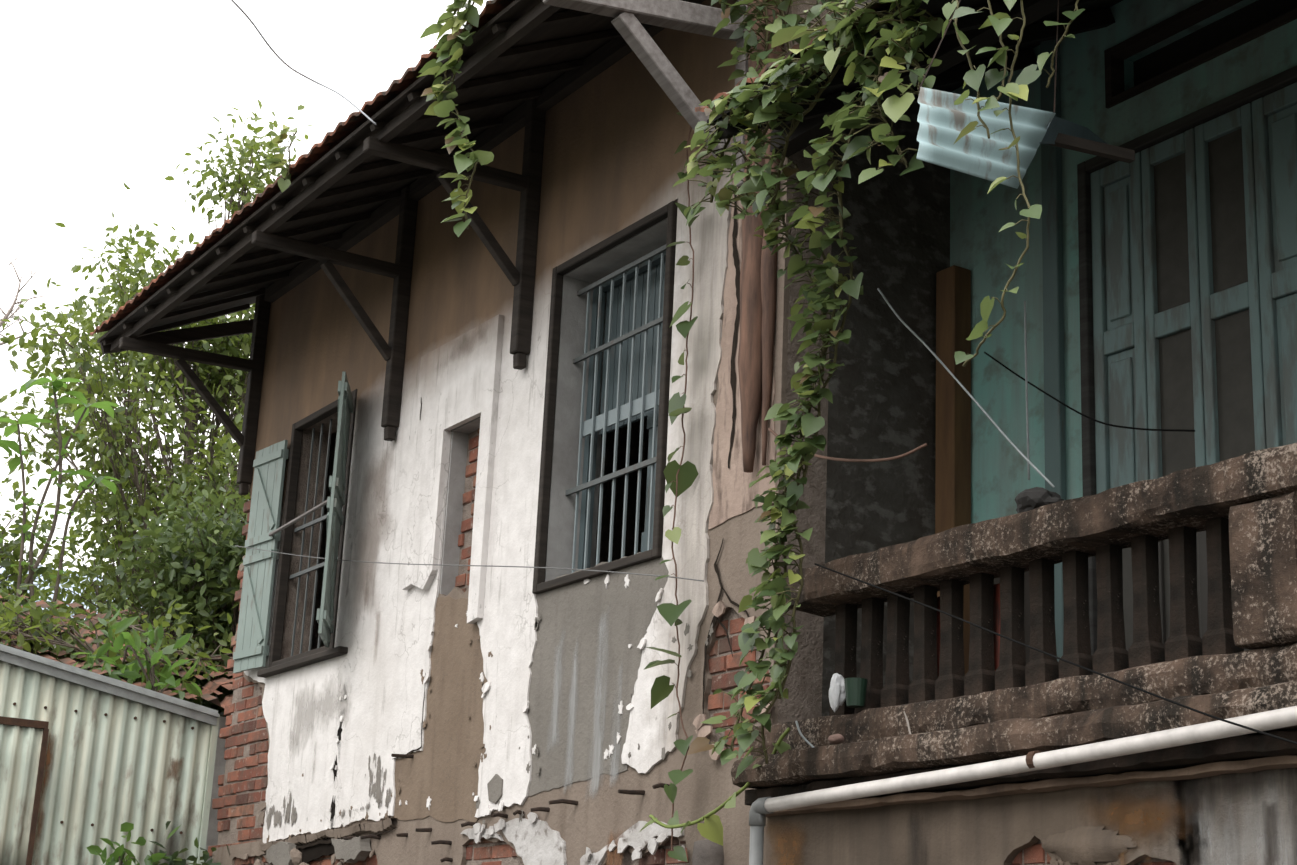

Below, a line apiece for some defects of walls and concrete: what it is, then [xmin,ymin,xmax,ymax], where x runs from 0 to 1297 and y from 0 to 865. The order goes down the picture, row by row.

peeling [320,428,689,865]
flaking render [672,600,772,760]
leakage [1261,807,1288,865]